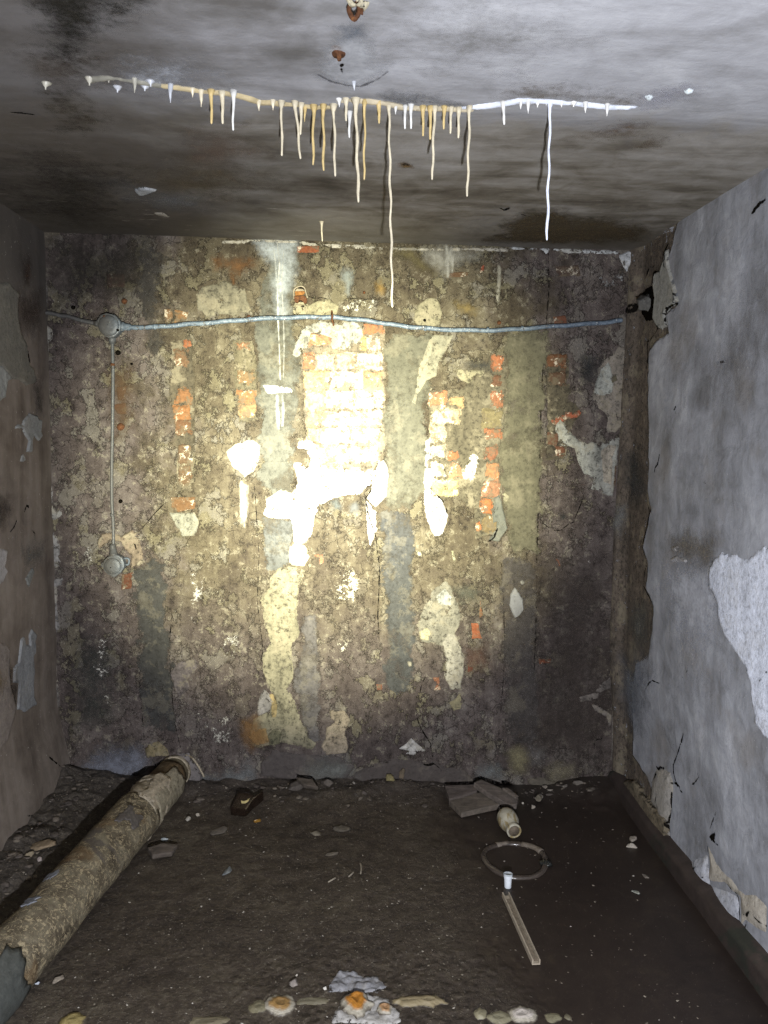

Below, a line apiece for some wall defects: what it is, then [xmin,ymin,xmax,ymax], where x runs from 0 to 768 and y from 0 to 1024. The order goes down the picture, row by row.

damp [86,68,667,112]
damp [222,212,645,362]
flaking render [226,440,260,477]
spalling [412,298,509,542]
peeling [0,629,37,749]
spalling [233,299,483,785]
flaking render [509,580,525,618]
spalling [545,224,679,836]
flaking render [671,547,768,738]
crack [650,735,699,838]
crack [692,818,718,878]
crack [727,884,767,928]